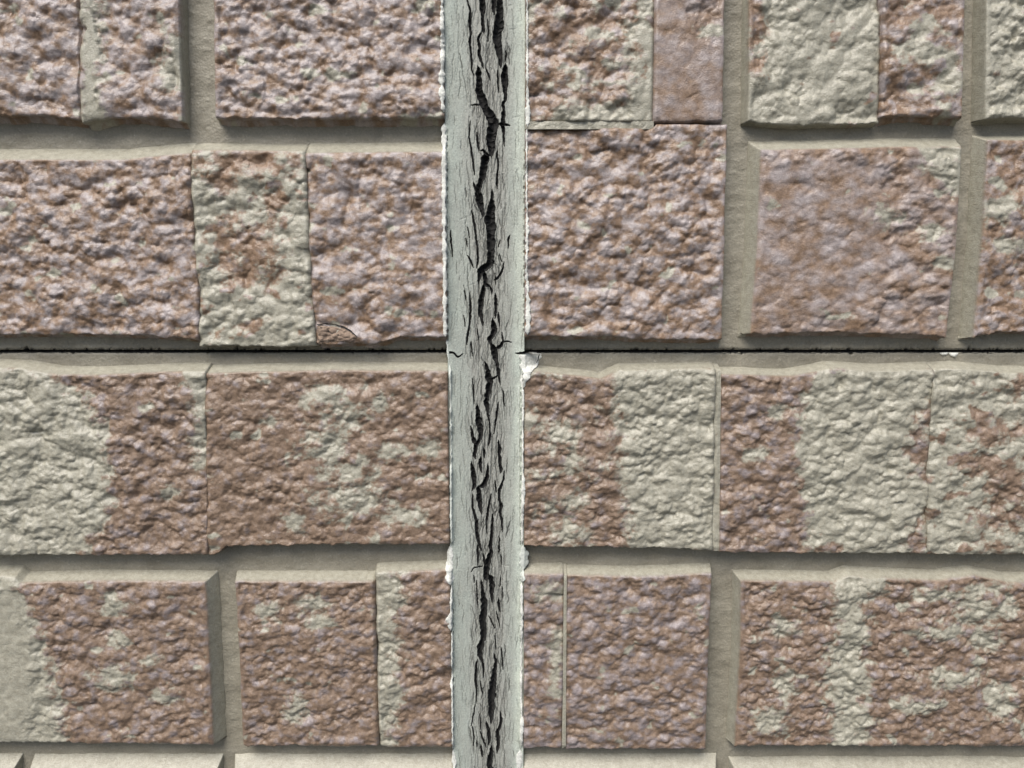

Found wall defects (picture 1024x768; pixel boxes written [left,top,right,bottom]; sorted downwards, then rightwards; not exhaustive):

crack [449,0,540,768]
peeling [516,352,542,768]